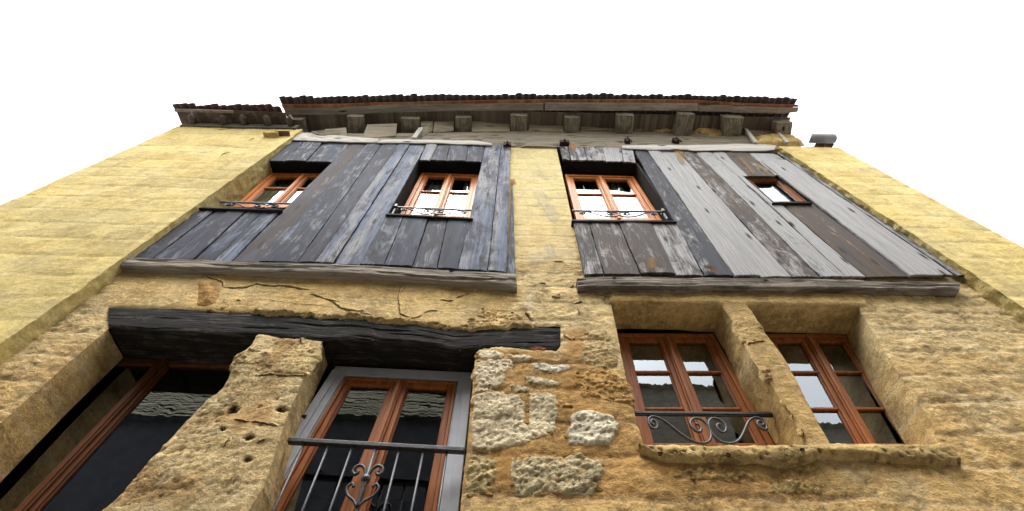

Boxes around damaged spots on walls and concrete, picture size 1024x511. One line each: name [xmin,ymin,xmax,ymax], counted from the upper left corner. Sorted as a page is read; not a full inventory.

crack [206,275,475,318]
spalling [462,332,635,497]